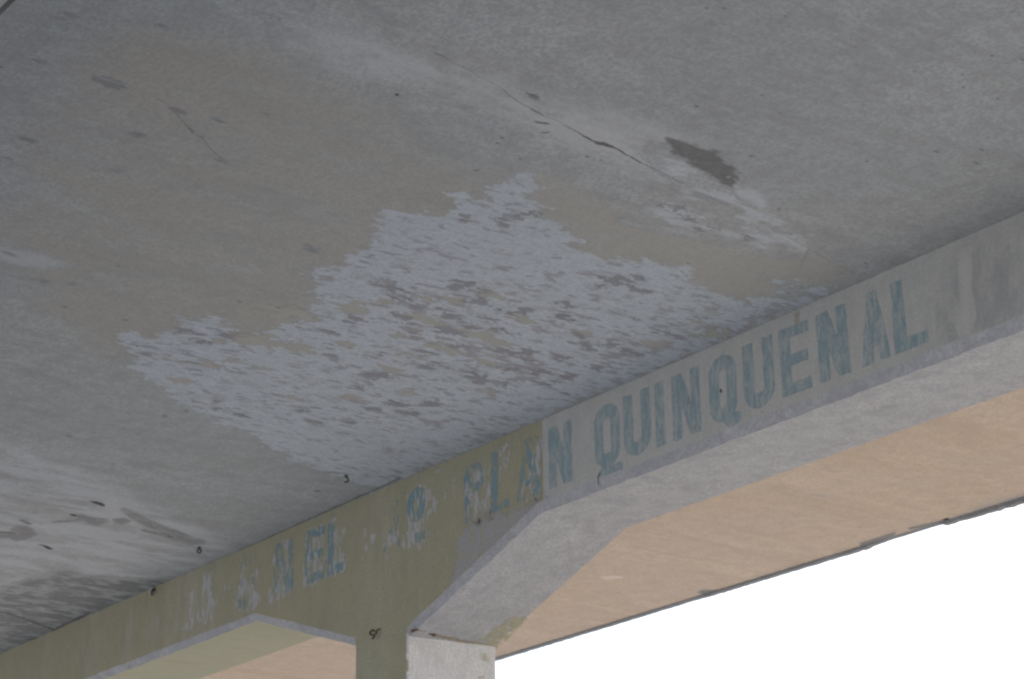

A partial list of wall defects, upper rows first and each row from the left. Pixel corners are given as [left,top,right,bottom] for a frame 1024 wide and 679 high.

damp [0,0,874,367]
crack [431,51,682,183]
peeling [112,170,838,585]